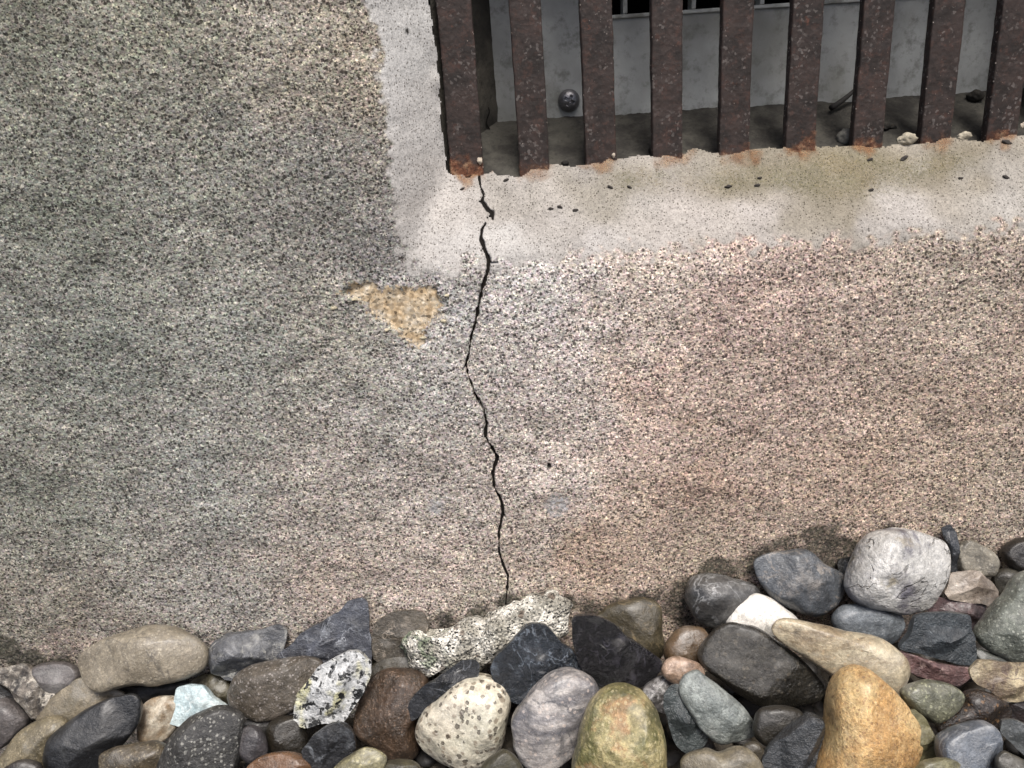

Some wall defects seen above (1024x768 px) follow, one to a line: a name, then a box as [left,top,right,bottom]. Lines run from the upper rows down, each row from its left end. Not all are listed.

corrosion [450,156,483,183]
spalling [331,281,449,349]
crack [464,176,509,605]